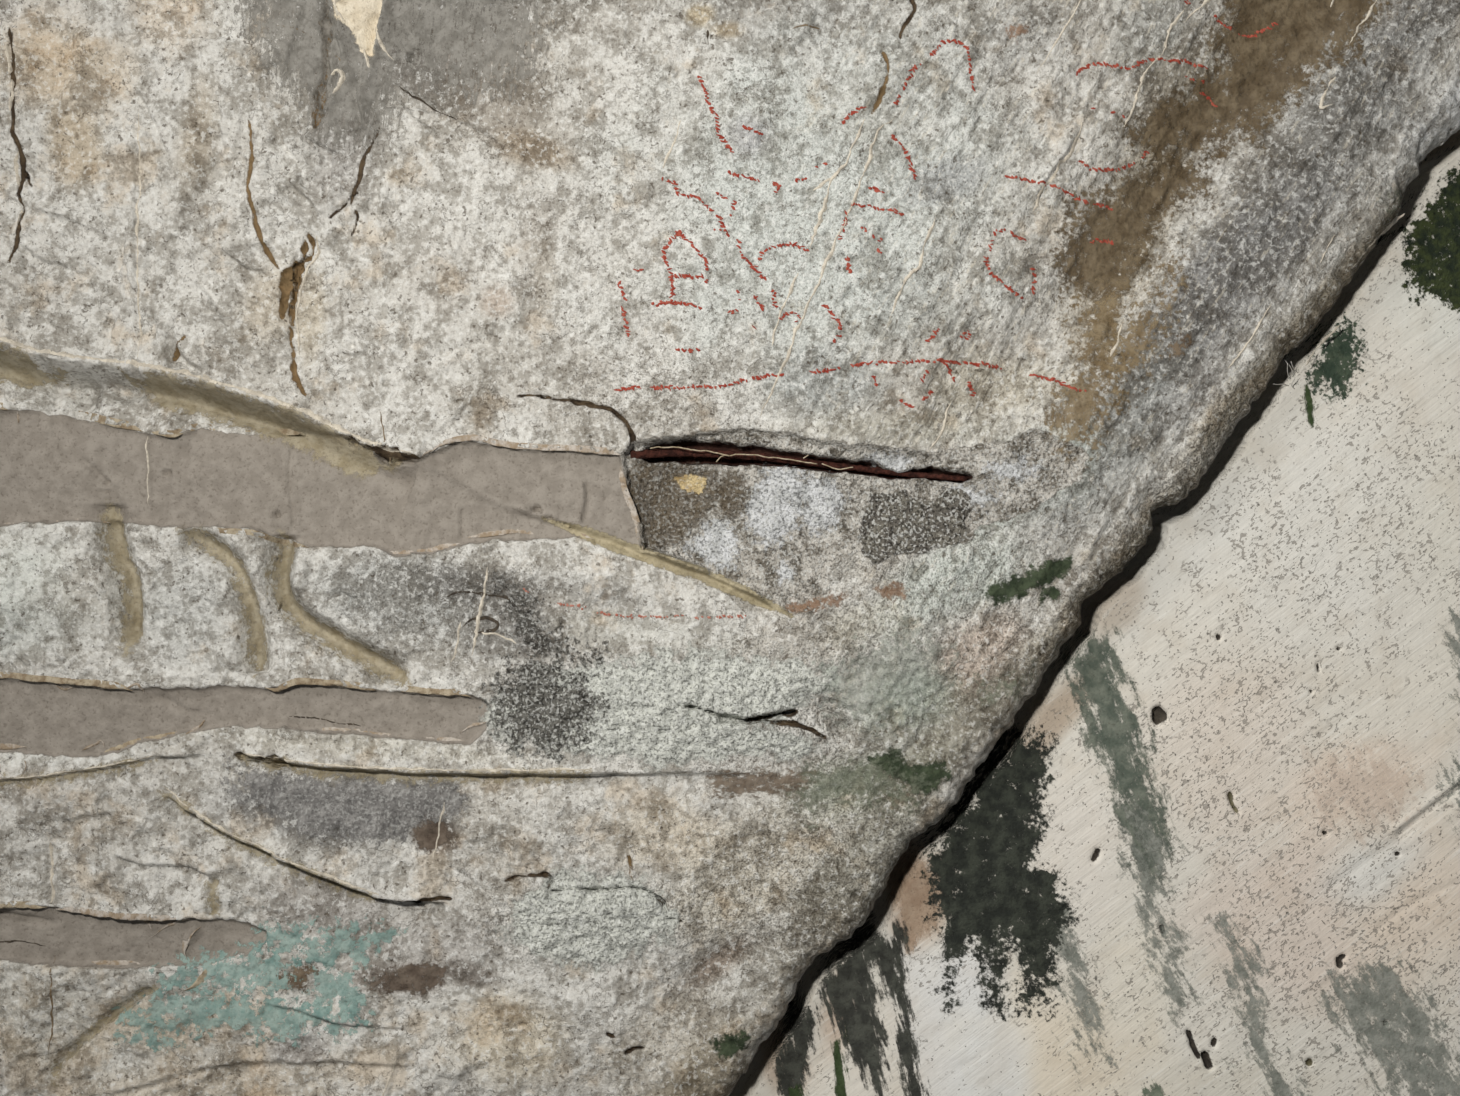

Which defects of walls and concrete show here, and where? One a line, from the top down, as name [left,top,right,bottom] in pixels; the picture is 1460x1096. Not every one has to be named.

crack [5,28,33,263]
crack [246,120,380,396]
peeling [226,0,567,164]
crack [871,0,917,114]
leakage [1030,0,1409,464]
peeling [0,402,1089,616]
peeling [0,901,268,991]
peeling [0,672,491,773]
crack [743,709,826,739]
leakage [768,719,1116,1096]
leakage [1052,626,1199,1026]